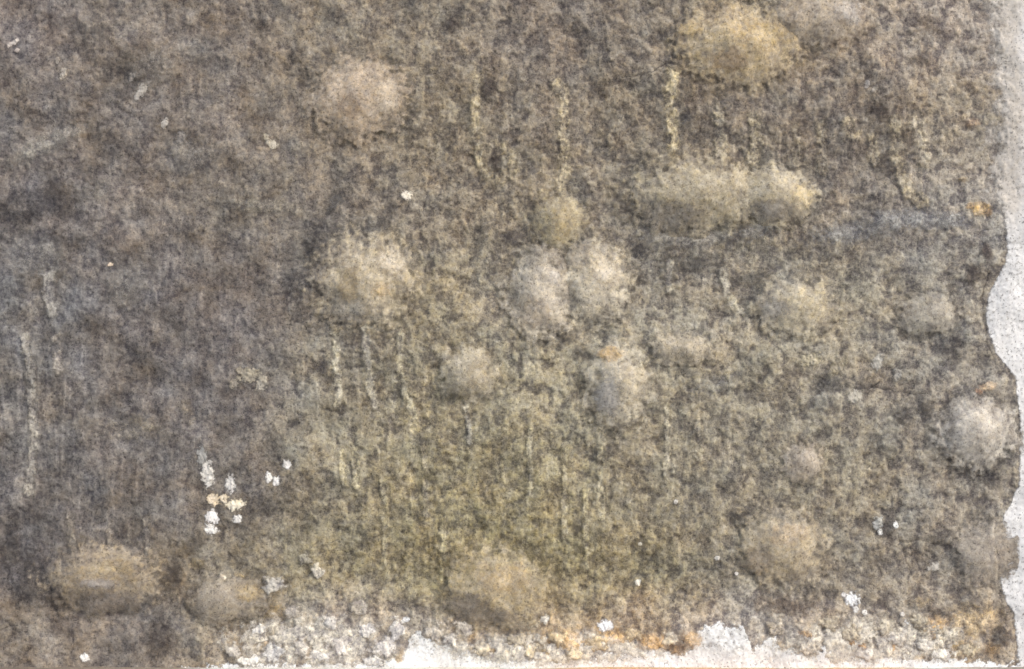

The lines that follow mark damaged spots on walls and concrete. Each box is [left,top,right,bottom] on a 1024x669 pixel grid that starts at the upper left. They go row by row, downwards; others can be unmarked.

peeling [206,0,1024,668]